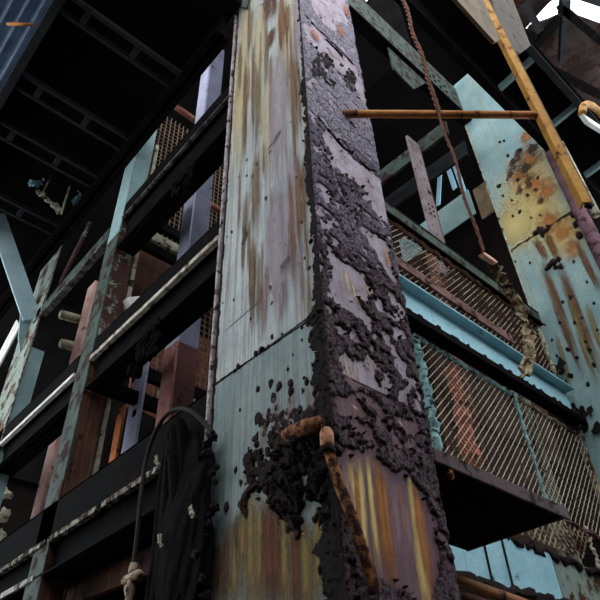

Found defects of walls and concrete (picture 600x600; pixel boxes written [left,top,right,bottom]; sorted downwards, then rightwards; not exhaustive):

spalling [305,34,366,106]
rust [210,0,332,429]
spalling [318,149,395,249]
rust [501,132,599,287]
rust [545,271,600,383]
rust [231,407,345,600]
rust [346,466,398,575]
rust [399,481,434,600]